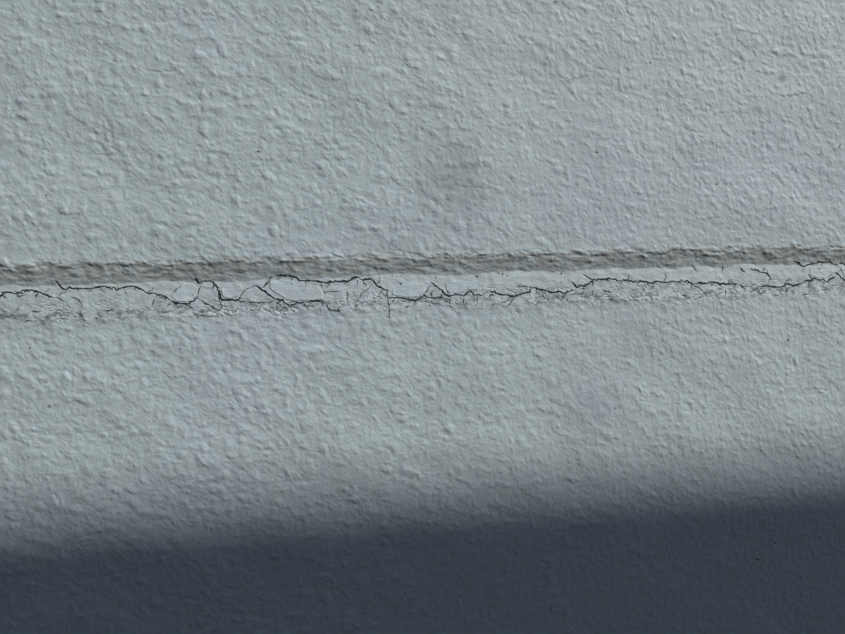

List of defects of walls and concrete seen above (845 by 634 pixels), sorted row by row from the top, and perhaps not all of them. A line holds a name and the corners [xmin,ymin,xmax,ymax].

crack [0,260,845,322]